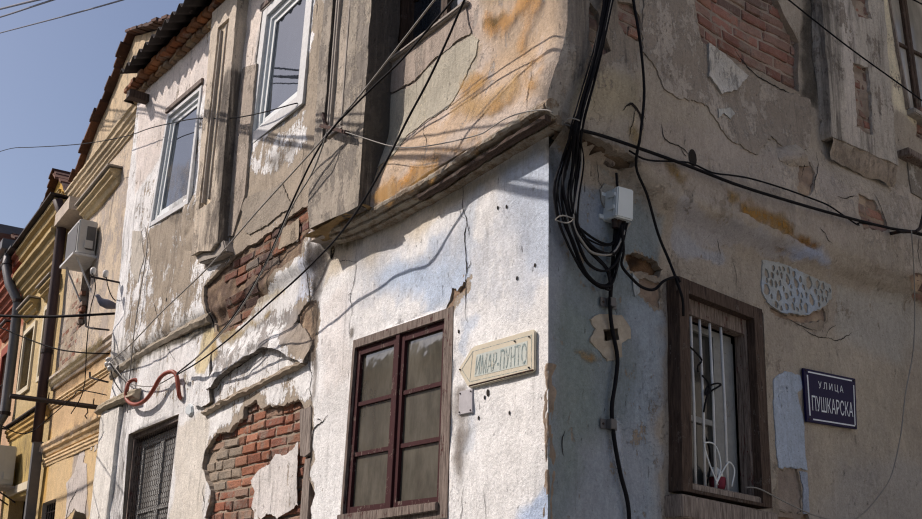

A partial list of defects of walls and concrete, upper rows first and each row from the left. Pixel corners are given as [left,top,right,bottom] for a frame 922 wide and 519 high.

peeling [617,0,812,155]
spalling [853,65,870,134]
flaking render [206,182,311,333]
crack [460,200,471,318]
spalling [589,314,631,362]
flaking render [626,255,659,308]
flaking render [206,402,306,519]
peeling [773,371,810,519]